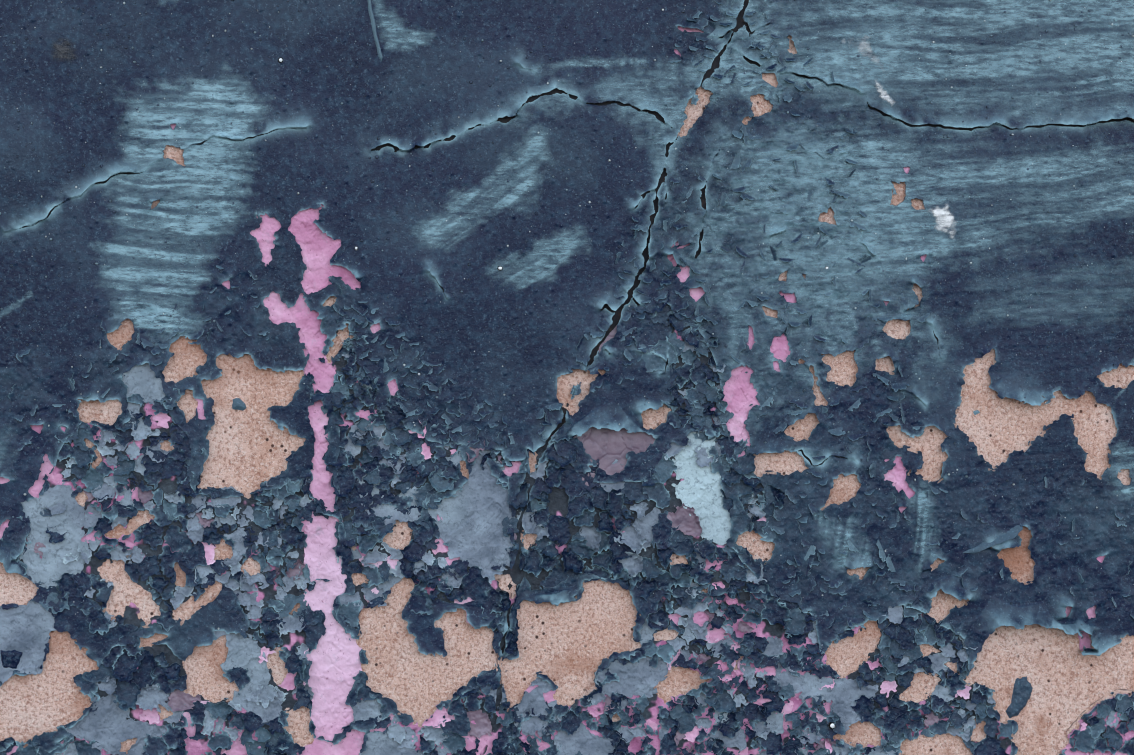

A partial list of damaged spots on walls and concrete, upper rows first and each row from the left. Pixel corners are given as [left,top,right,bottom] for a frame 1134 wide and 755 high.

peeling [669,0,814,203]
crack [694,0,1134,138]
crack [0,121,313,239]
crack [363,58,726,455]
peeling [805,177,867,250]
peeling [885,174,931,217]
peeling [0,214,1134,755]
crack [790,445,863,472]
crack [898,386,931,413]
crack [925,319,947,364]
crack [495,570,522,688]